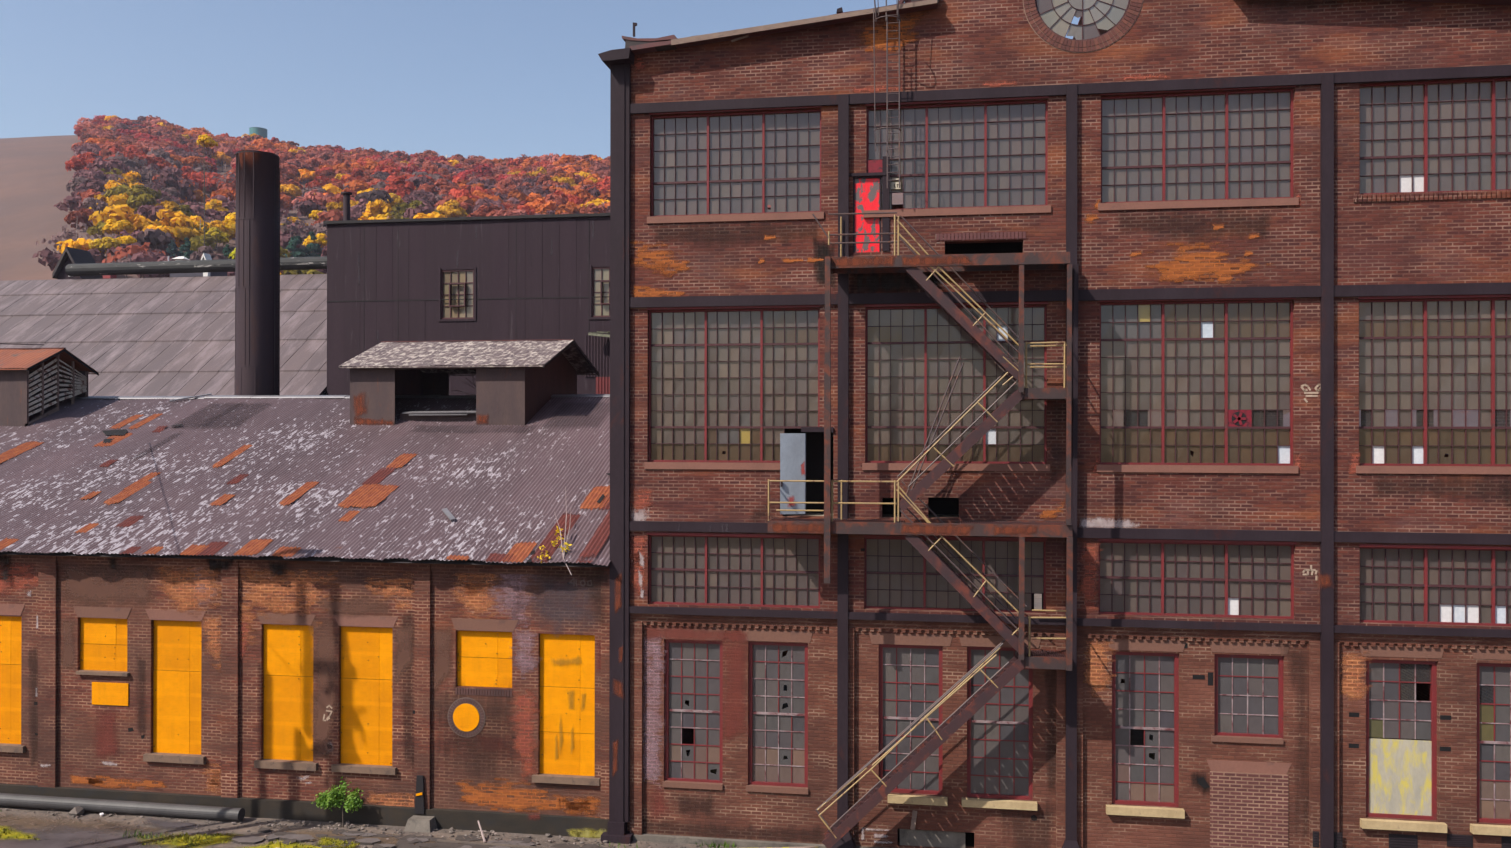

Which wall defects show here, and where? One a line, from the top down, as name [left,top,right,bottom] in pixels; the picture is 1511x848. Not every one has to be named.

spalling [860,11,927,52]
spalling [630,241,690,297]
spalling [1130,225,1267,283]
rust [0,441,44,463]
rust [74,472,162,533]
rust [210,444,253,506]
rust [338,453,417,522]
rust [447,485,610,563]
spalling [456,690,601,818]